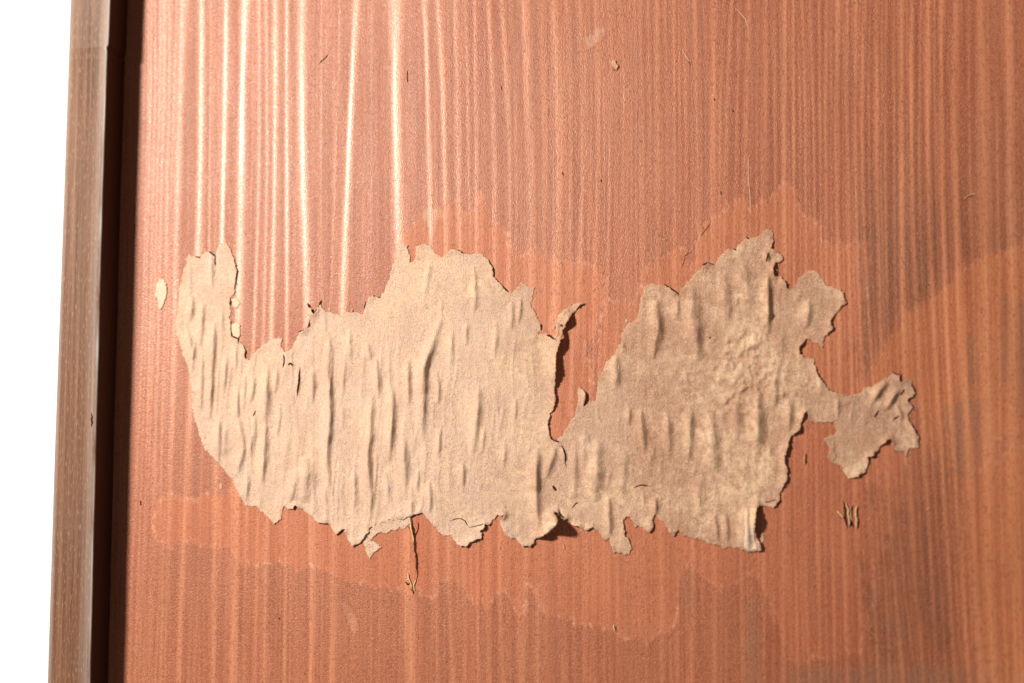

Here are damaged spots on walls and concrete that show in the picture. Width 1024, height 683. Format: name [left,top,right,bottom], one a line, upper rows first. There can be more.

peeling [155,279,167,309]
peeling [231,322,240,338]